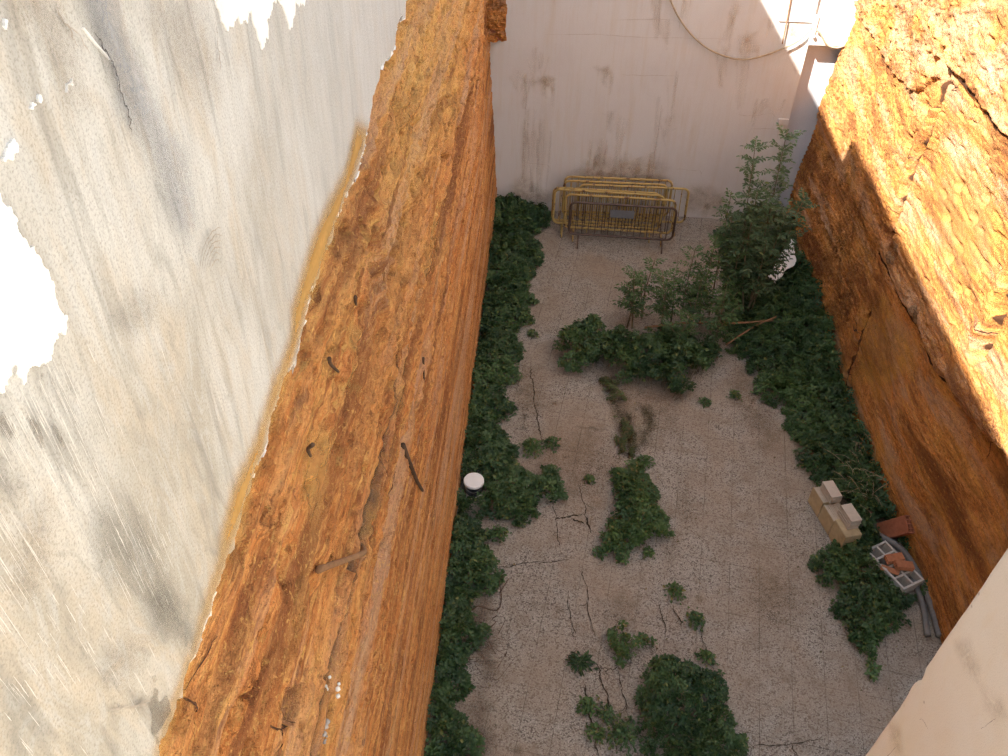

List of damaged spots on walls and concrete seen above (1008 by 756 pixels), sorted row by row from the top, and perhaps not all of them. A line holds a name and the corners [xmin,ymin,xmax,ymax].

peeling [82,27,111,60]
peeling [214,0,306,50]
peeling [1,138,19,162]
crack [878,72,1008,382]
peeling [0,193,68,394]
crack [530,368,542,440]
crack [499,483,595,637]
crack [658,603,705,647]
crack [584,662,628,756]
crack [752,739,824,756]